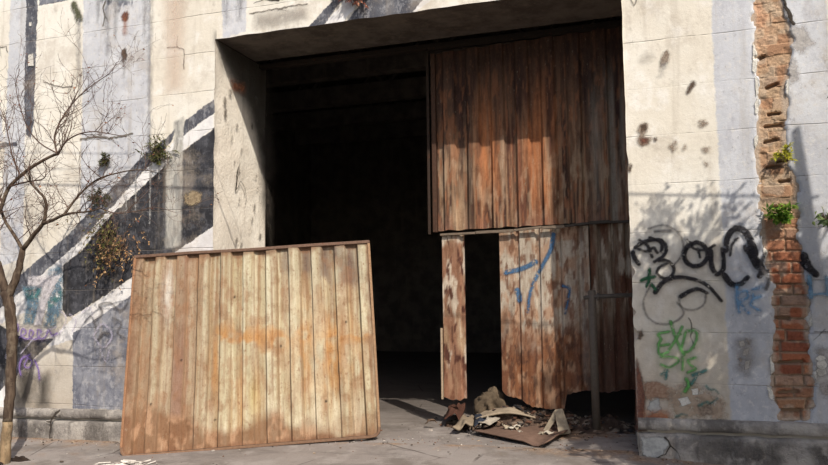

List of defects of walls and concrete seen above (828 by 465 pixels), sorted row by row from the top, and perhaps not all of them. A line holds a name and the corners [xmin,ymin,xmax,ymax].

crack [250,0,307,14]
spalling [751,0,828,421]
peeling [667,385,724,420]